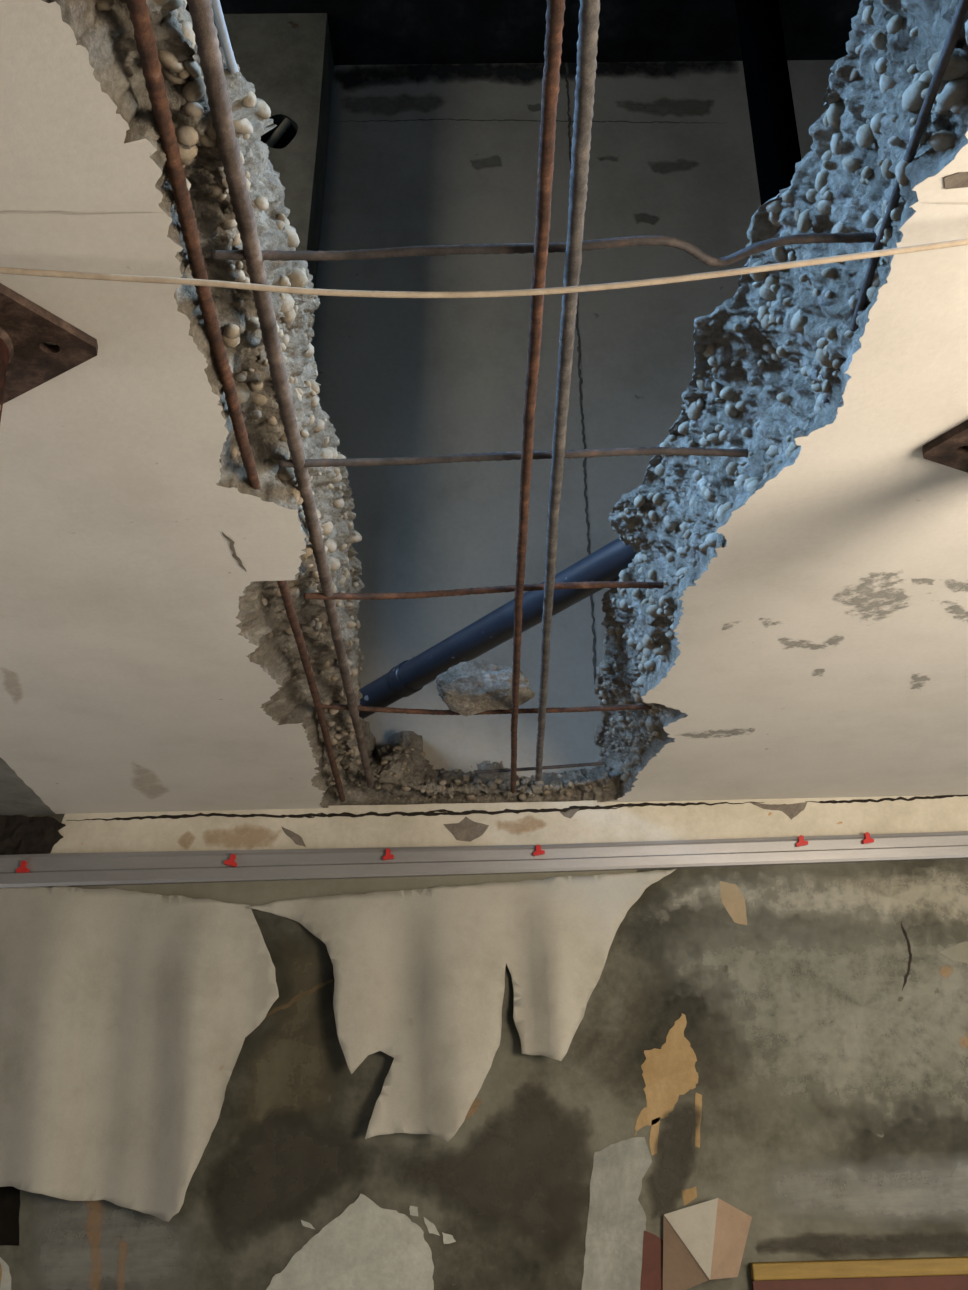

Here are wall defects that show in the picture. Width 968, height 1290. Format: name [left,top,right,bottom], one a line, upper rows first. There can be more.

spalling [41,0,968,842]
crack [66,802,764,821]
crack [805,795,968,804]
peeling [670,868,968,1119]
flaking render [634,1013,702,1214]
flaking render [0,1186,20,1246]
peeling [409,1206,456,1244]
water stain [757,1161,968,1257]
peeling [640,1231,663,1290]